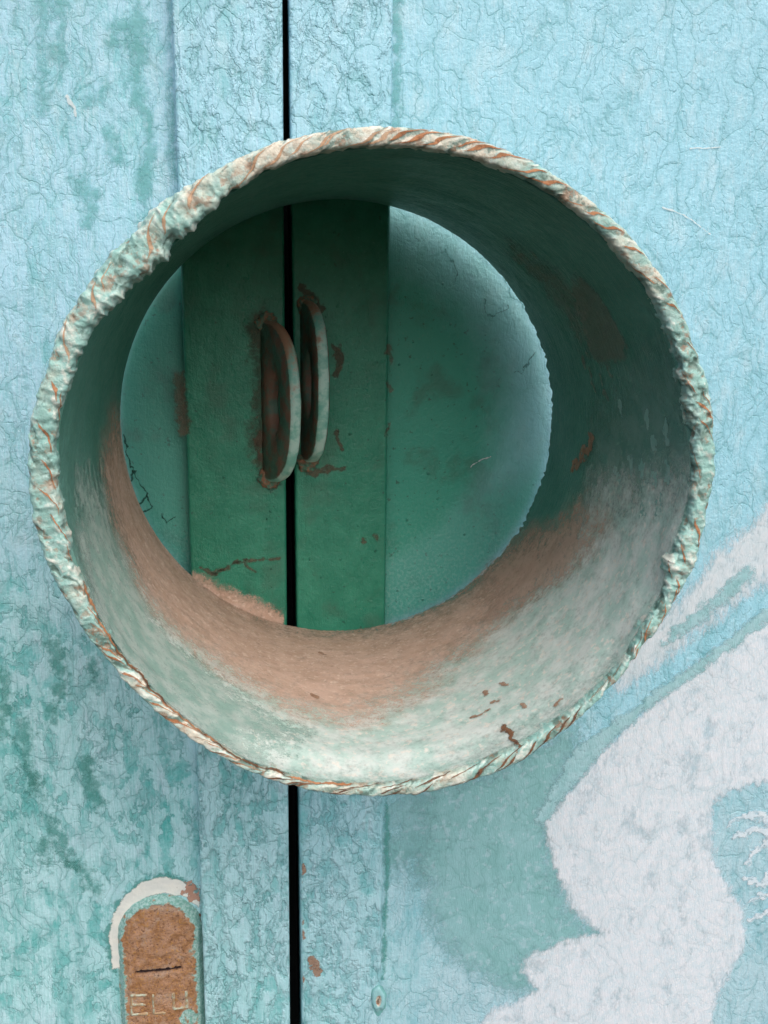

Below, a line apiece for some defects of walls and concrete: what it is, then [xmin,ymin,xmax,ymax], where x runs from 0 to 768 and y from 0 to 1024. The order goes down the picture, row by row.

rust [229,128,566,191]
rust [147,204,171,257]
rust [567,200,623,232]
rust [172,371,190,436]
rust [38,424,72,561]
crack [123,434,176,523]
rust [104,412,604,726]
rust [592,560,680,697]
rust [84,584,581,797]
peeling [105,873,200,972]
rust [303,956,323,982]